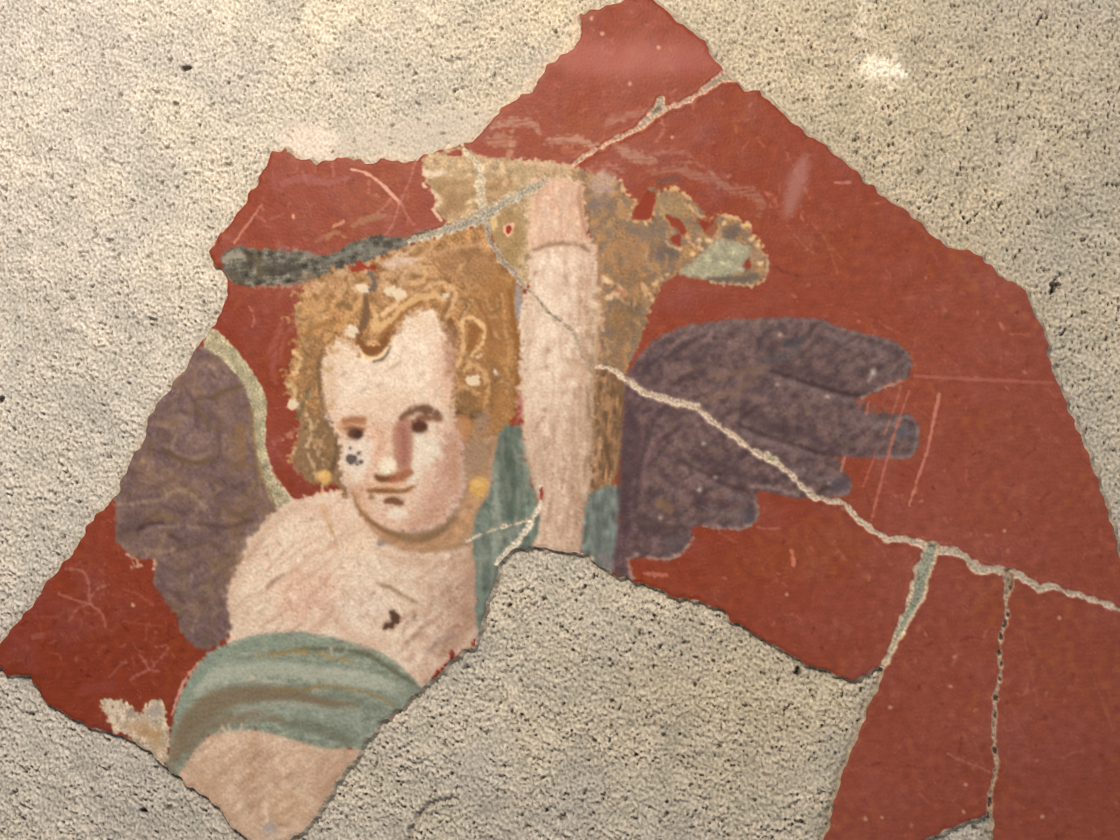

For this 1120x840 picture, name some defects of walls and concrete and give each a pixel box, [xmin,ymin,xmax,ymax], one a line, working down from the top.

peeling [100,698,171,766]
crack [408,71,1120,817]